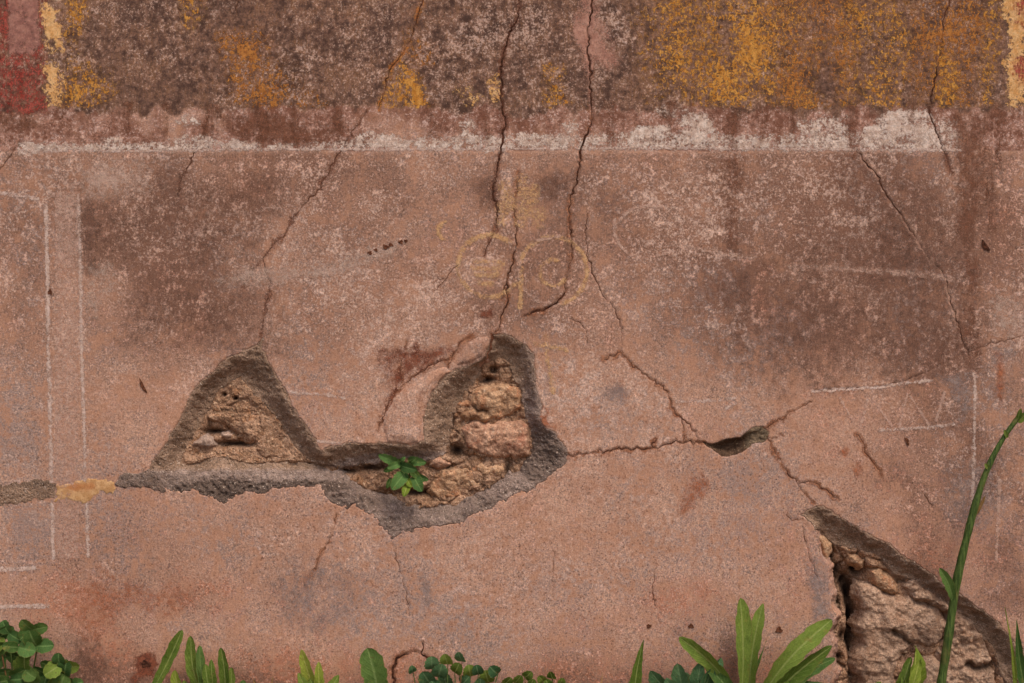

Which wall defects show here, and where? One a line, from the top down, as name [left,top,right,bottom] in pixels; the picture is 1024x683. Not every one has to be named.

crack [241,0,424,337]
crack [377,0,707,461]
crack [857,152,1014,383]
crack [926,0,954,174]
spalling [150,334,568,539]
spalling [800,506,1024,683]